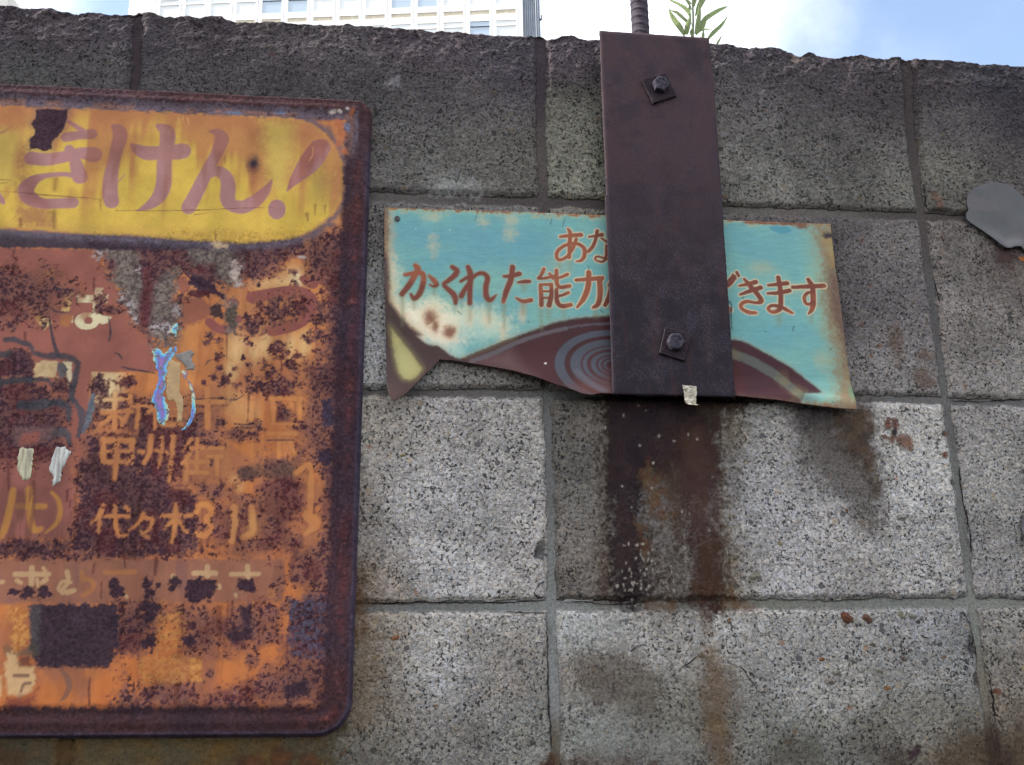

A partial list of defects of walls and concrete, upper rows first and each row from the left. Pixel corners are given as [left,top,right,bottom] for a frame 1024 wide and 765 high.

corrosion [604,394,747,618]
damp [800,405,886,532]
corrosion [882,417,914,452]
crack [959,467,972,554]